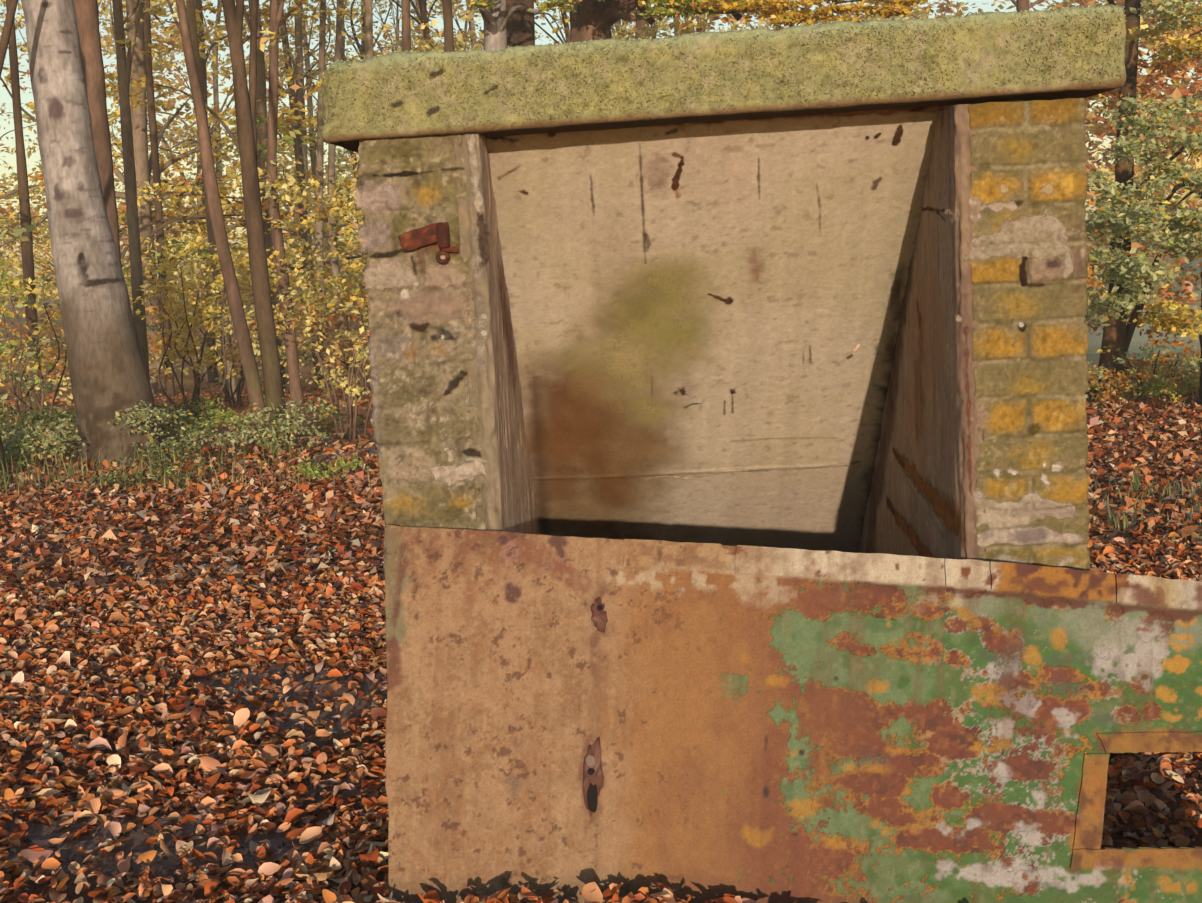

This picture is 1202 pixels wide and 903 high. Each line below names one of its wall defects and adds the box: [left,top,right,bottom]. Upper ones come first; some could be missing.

damp [527,360,770,540]
rust [886,498,934,558]
rust [892,447,966,543]